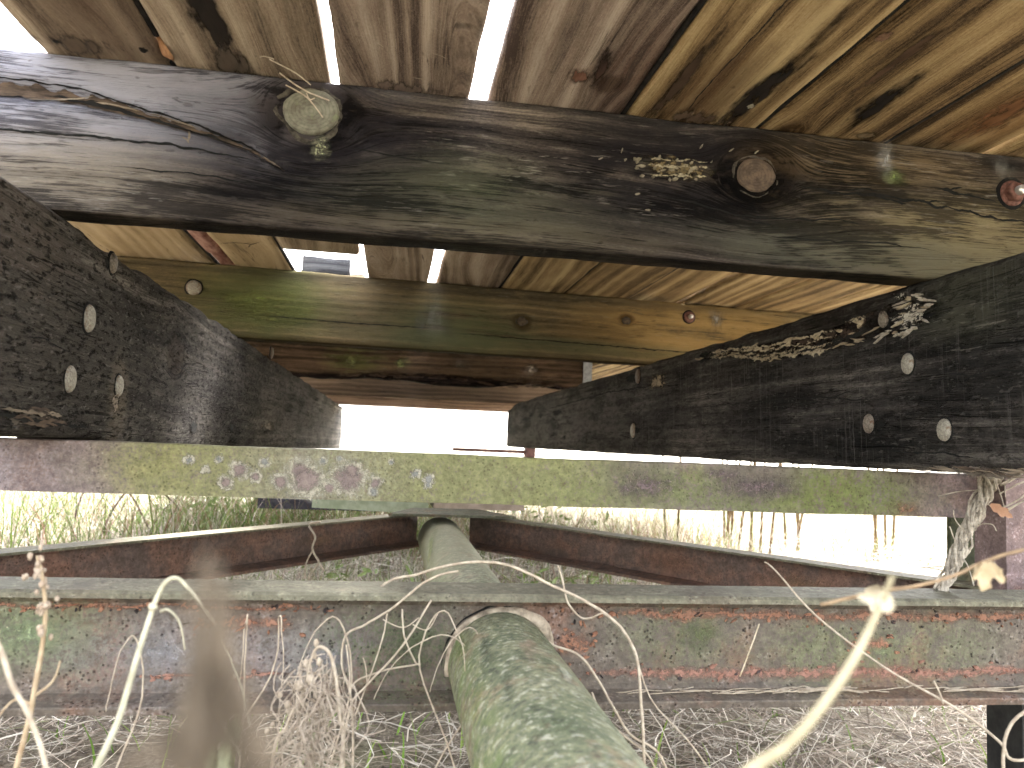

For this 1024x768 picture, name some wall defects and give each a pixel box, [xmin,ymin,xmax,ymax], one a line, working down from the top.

peeling [621,144,714,181]
peeling [696,293,936,362]
corrosion [557,606,1024,682]